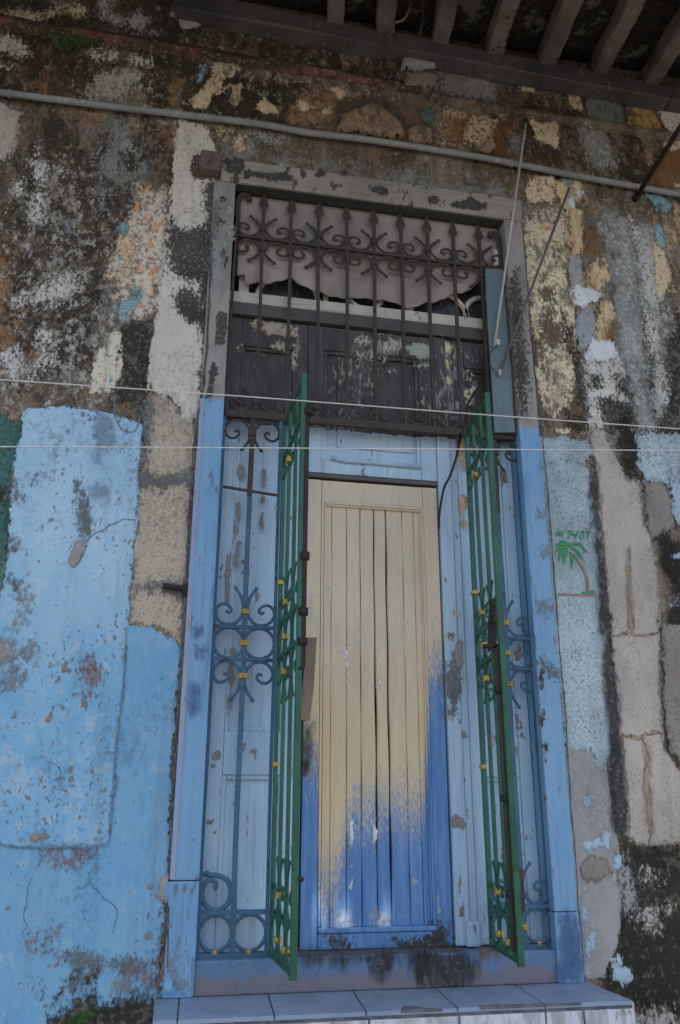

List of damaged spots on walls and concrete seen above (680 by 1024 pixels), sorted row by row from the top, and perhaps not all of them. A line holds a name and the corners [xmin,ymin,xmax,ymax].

flaking render [0,101,25,162]
peeling [10,136,69,228]
peeling [11,267,83,310]
peeling [89,179,171,396]
peeling [0,325,60,387]
crack [69,518,136,568]
flaking render [505,175,680,988]
peeling [441,632,467,738]
leakage [588,456,680,1013]
crack [0,628,127,934]
peeling [19,833,98,873]
leakage [308,948,475,988]